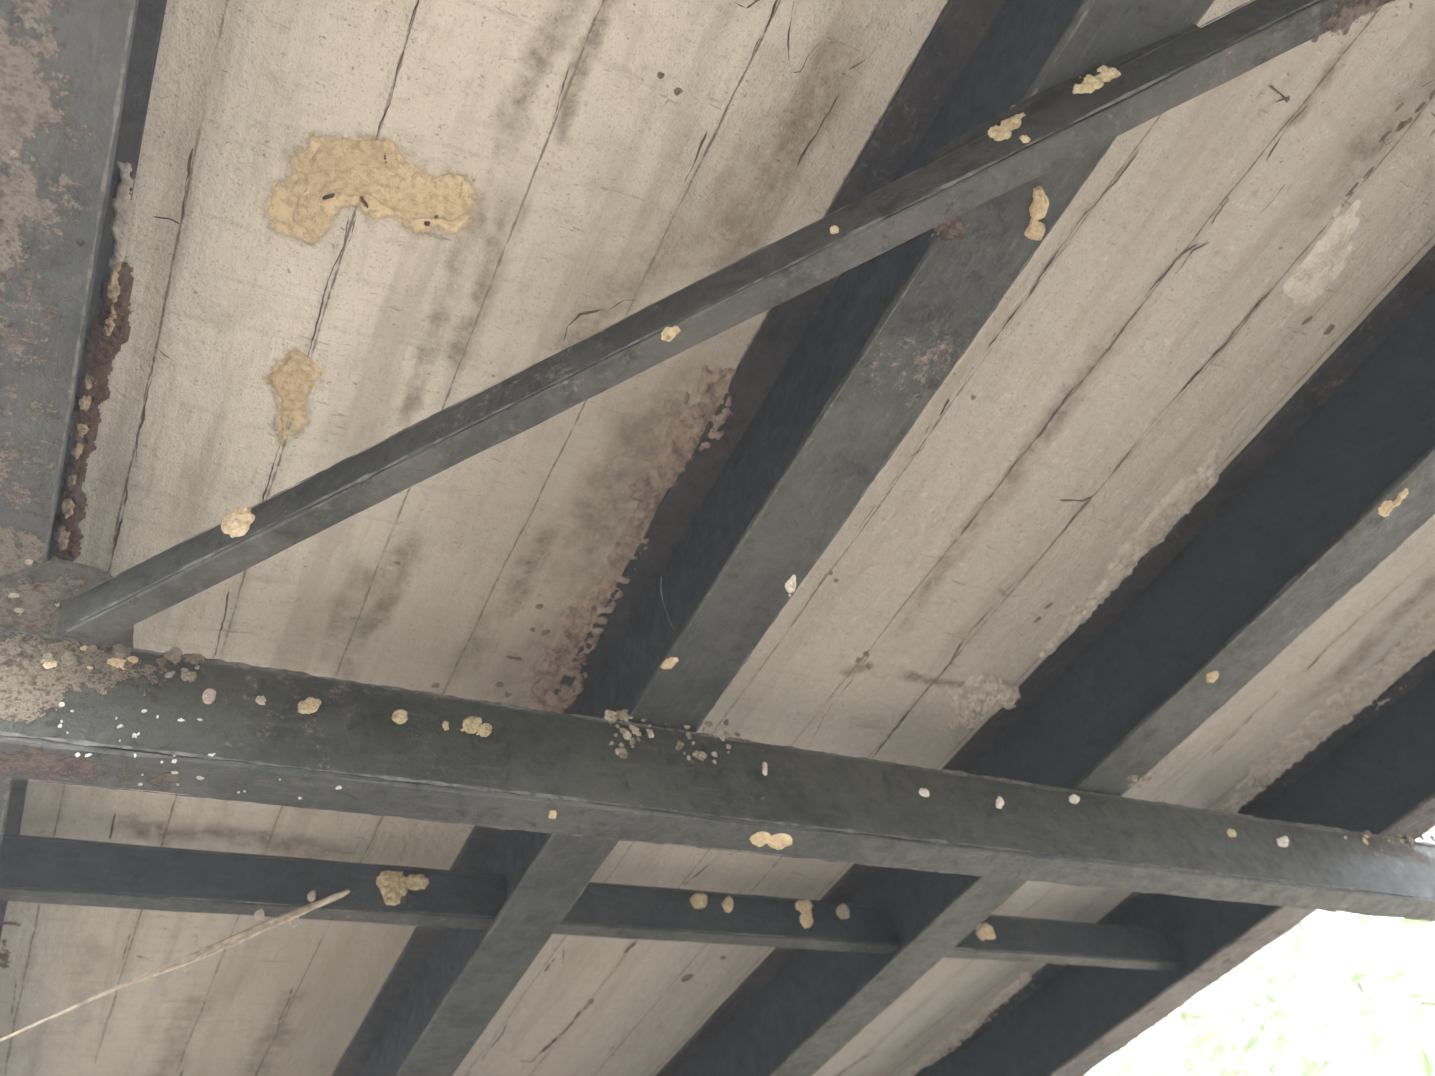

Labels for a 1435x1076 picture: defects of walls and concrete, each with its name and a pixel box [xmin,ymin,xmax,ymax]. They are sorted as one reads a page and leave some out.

crack [375,0,420,141]
crack [152,148,193,224]
crack [684,132,707,182]
crack [1263,85,1307,211]
corrosion [0,0,182,726]
crack [307,209,356,358]
crack [856,151,1139,532]
crack [954,201,1228,543]
crack [108,347,172,571]
crack [873,254,1307,757]
crack [213,588,230,659]
corrosion [0,745,182,791]